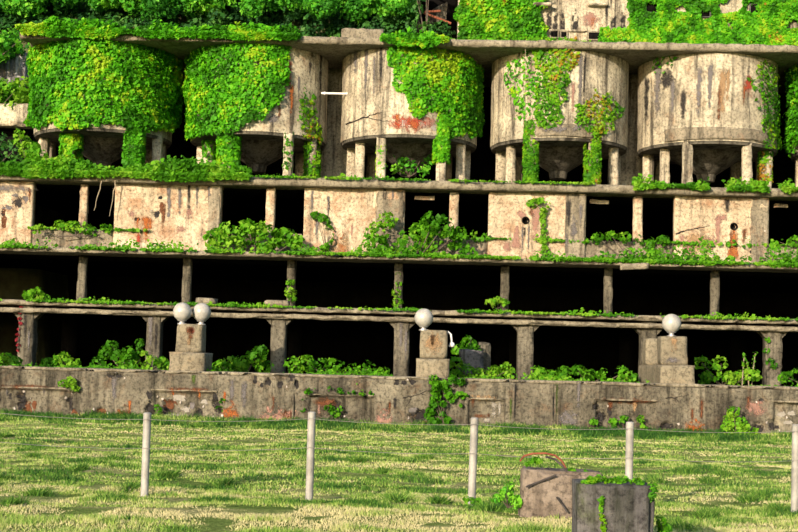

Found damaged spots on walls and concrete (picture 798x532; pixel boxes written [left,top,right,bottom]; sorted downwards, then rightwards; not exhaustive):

leakage [644,65,686,124]
leakage [696,64,713,113]
rust [717,70,730,120]
rust [389,114,435,131]
rust [128,211,152,242]
rust [680,215,746,257]
rust [746,397,764,415]